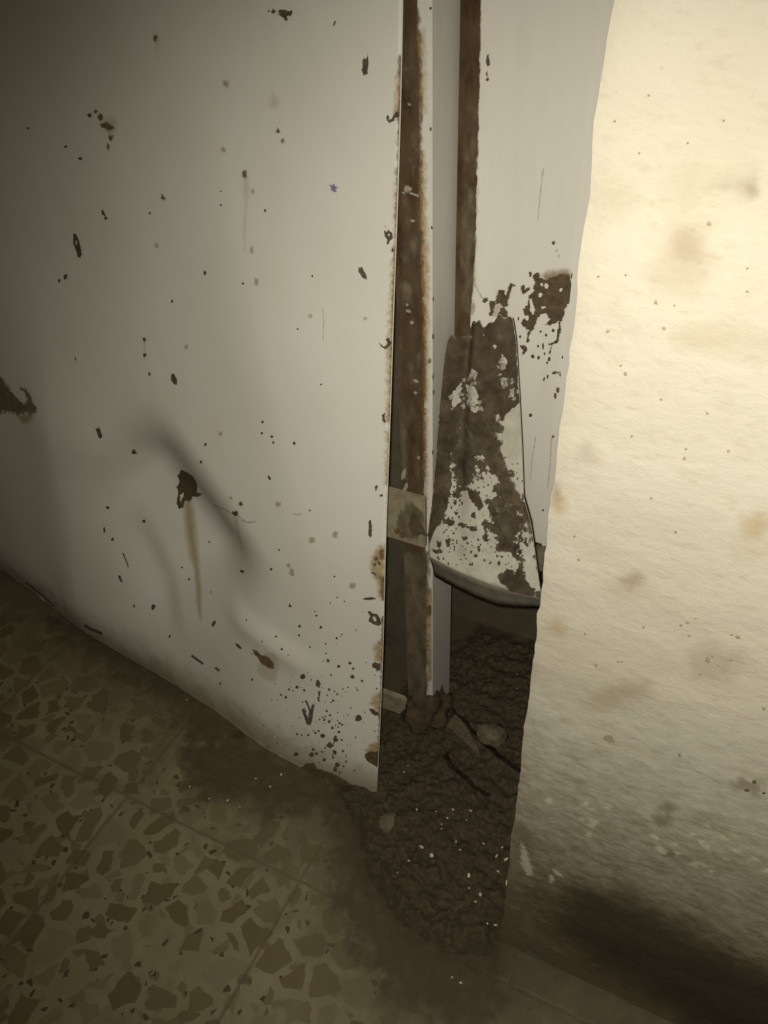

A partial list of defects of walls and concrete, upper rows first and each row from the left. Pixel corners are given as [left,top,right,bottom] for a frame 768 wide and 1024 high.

corrosion [387,0,573,696]
corrosion [176,470,201,573]
corrosion [371,547,385,600]
spalling [431,461,524,567]
spalling [267,634,384,778]
damp [569,895,768,1024]